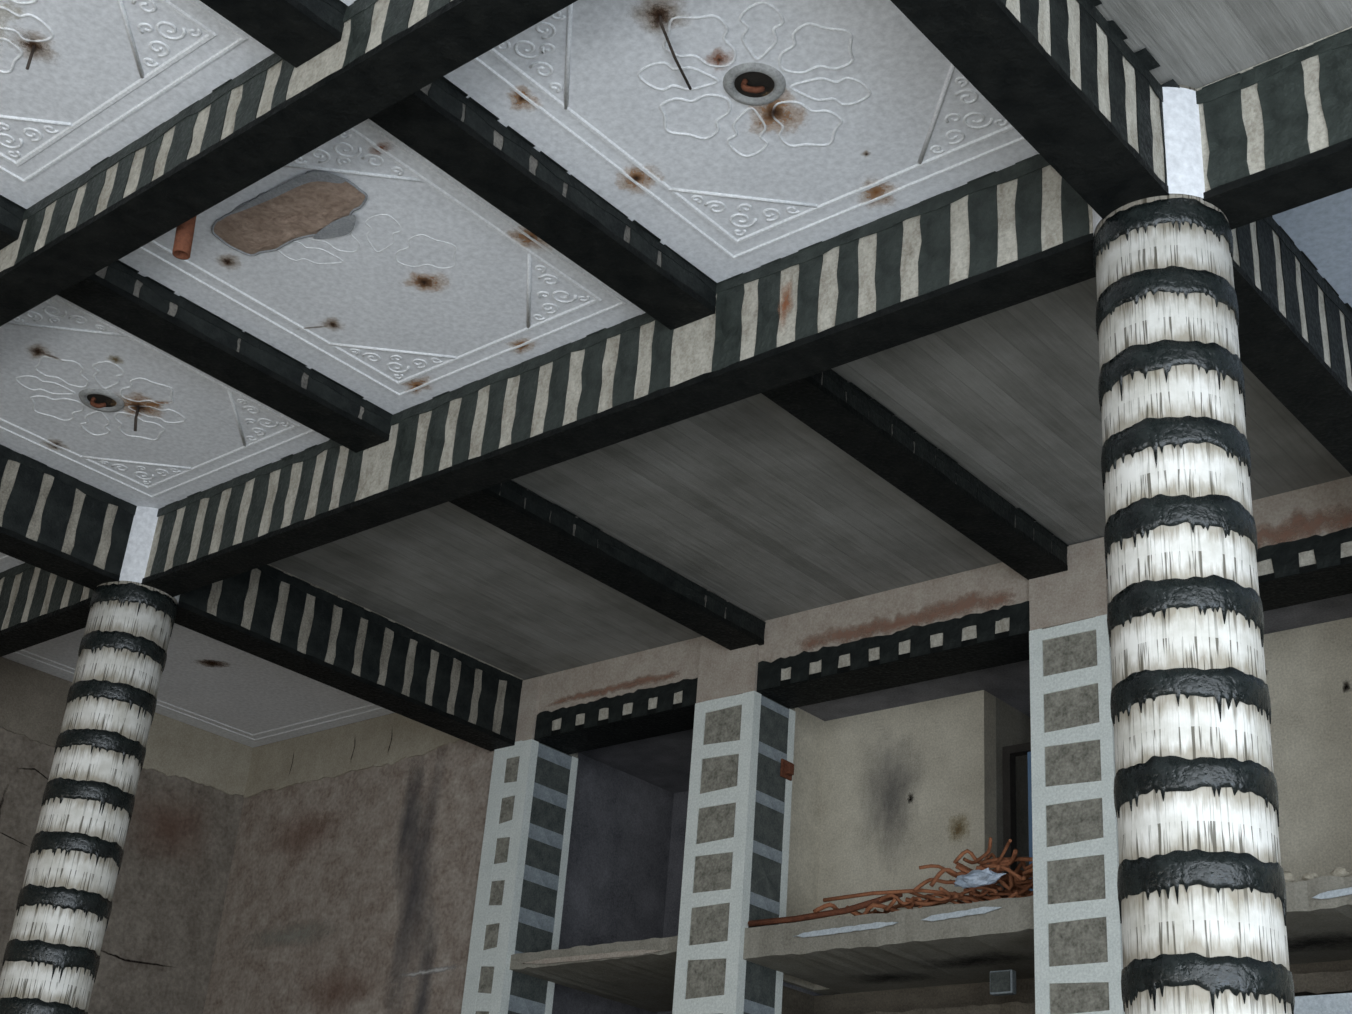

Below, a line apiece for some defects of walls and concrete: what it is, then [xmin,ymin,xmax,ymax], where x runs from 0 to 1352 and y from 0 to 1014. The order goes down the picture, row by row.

corrosion [20,35,49,56]
corrosion [756,98,800,127]
spalling [211,170,368,256]
corrosion [411,275,437,289]
corrosion [124,396,168,413]
crack [0,768,47,846]